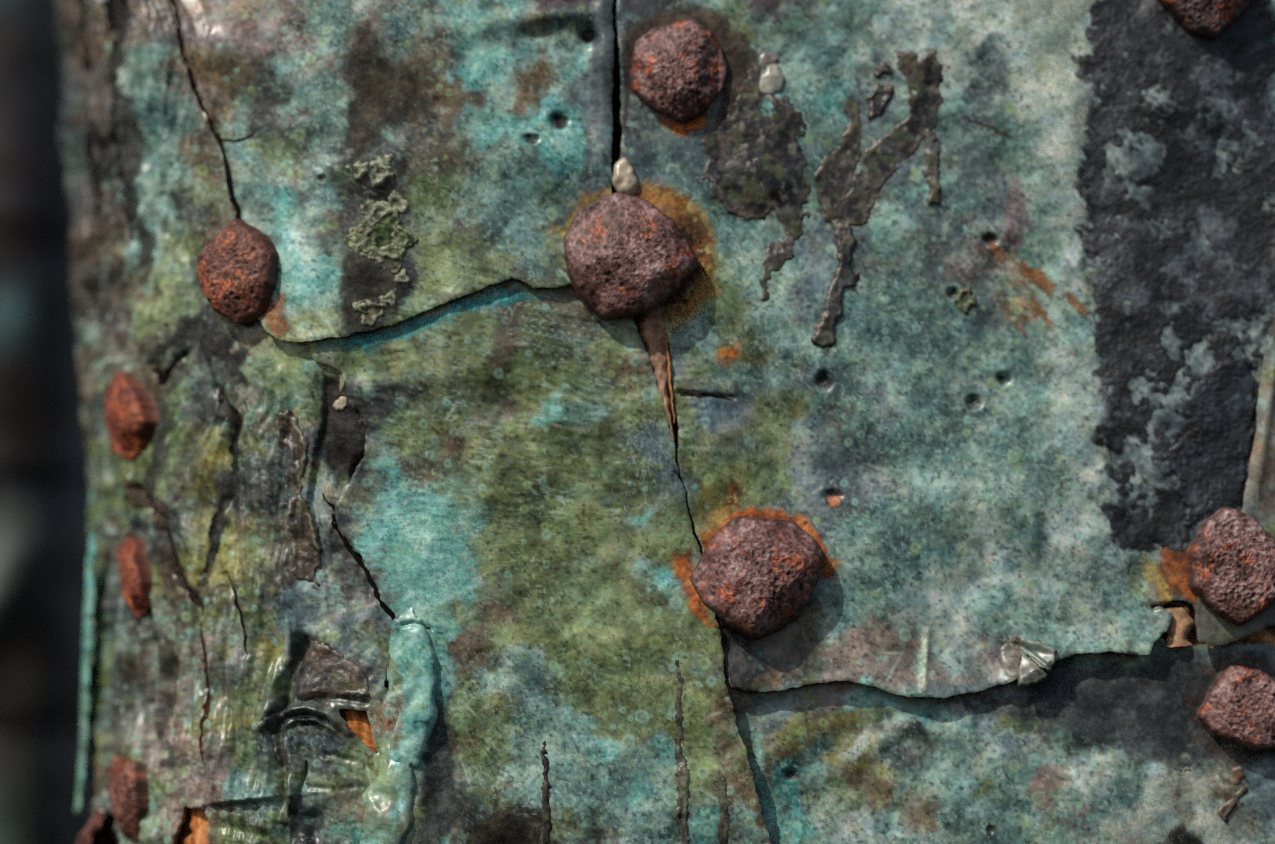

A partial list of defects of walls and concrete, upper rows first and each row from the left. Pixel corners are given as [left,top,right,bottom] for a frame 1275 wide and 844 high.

crack [77,0,134,246]
crack [169,0,256,219]
rust [662,115,705,136]
rust [263,294,288,337]
rust [633,184,717,328]
damp [1028,0,1275,552]
crack [680,392,733,400]
crack [322,493,395,620]
rust [674,479,840,626]
rust [1145,546,1197,603]
peeling [294,640,370,702]
rust [1185,656,1275,765]